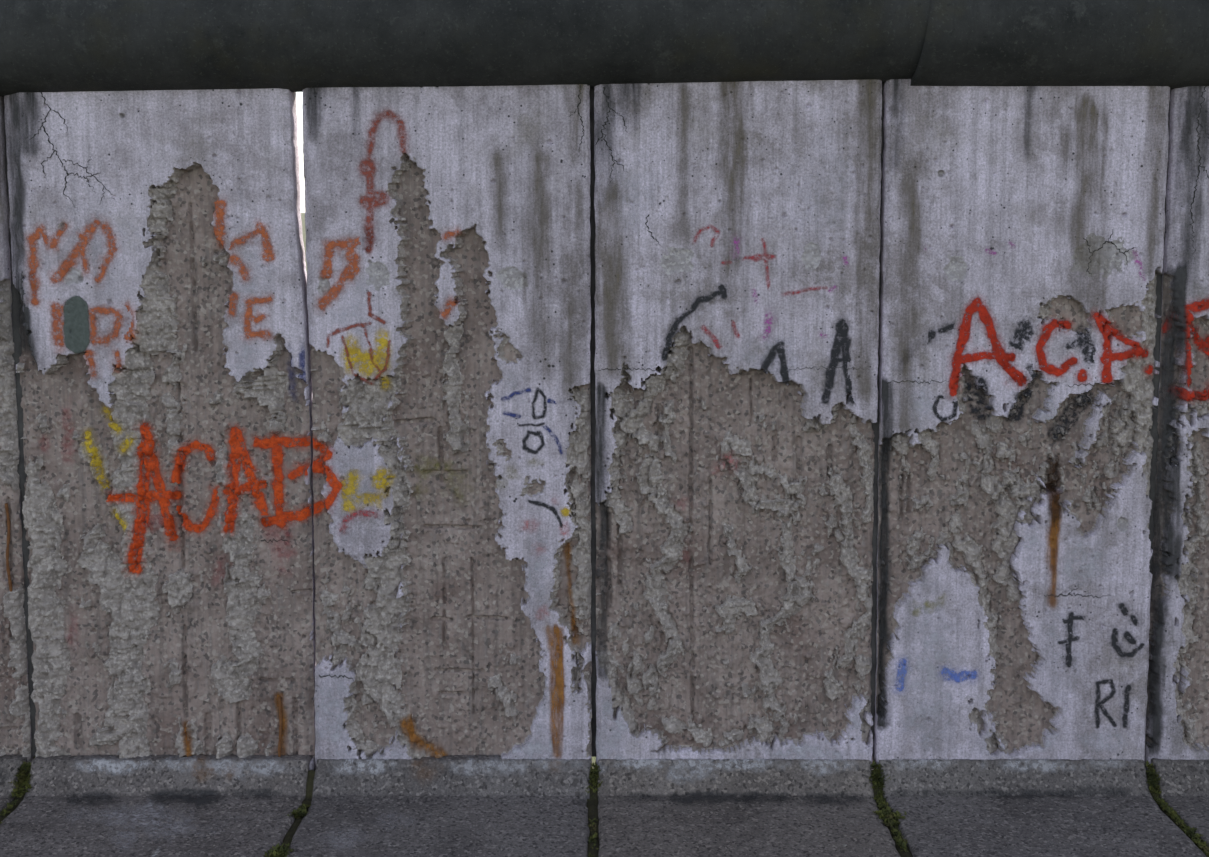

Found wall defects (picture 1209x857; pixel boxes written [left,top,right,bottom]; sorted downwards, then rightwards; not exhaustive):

crack [31,92,117,205]
water stain [1076,97,1098,155]
water stain [905,182,920,251]
water stain [1073,172,1100,270]
spalling [1071,233,1138,279]
spalling [0,153,547,763]
spalling [548,270,1209,757]
corrosion [1045,458,1062,606]
corrosion [547,543,576,756]